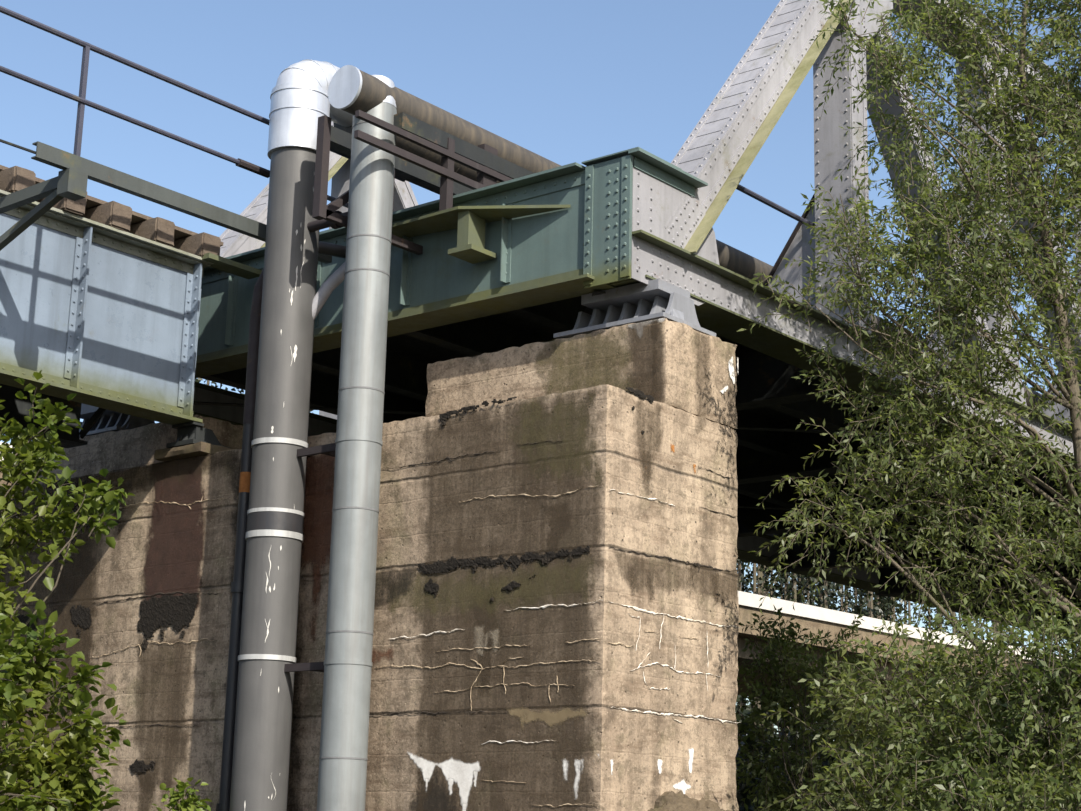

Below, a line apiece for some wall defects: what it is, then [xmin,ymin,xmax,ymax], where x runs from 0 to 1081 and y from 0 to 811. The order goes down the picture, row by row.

spalling [439,397,517,426]
leakage [628,318,665,482]
leakage [720,357,738,393]
crack [462,484,674,506]
leakage [0,450,241,778]
leakage [136,641,190,811]
peeling [138,593,199,650]
leakage [287,610,302,811]
spalling [418,546,590,601]
leakage [408,393,613,811]
crack [484,738,553,746]
crack [371,600,742,723]